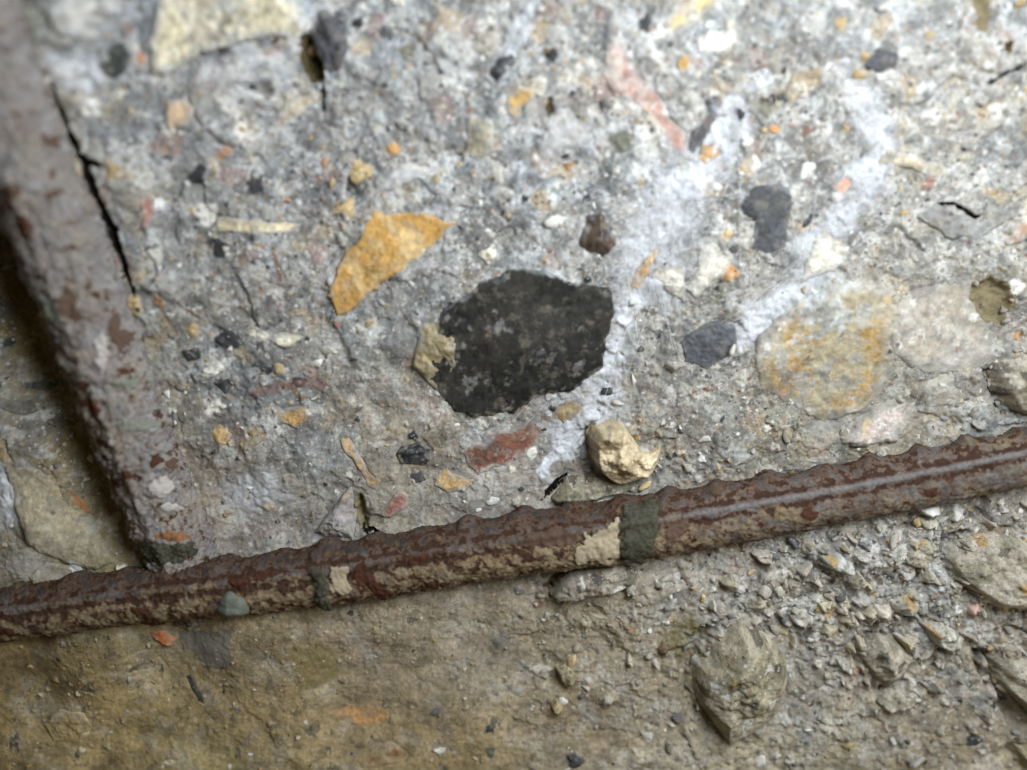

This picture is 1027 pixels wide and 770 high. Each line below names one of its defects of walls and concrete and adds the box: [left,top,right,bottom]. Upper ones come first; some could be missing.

crack [50,81,135,295]
rust [150,453,179,474]
spalling [228,478,275,505]
peeling [551,471,637,505]
rust [919,487,938,498]
spalling [354,492,371,532]
rust [801,503,819,522]
rust [155,530,195,542]
rust [354,560,394,600]
spalling [543,571,570,590]
rust [130,607,165,626]
peeling [149,629,176,647]